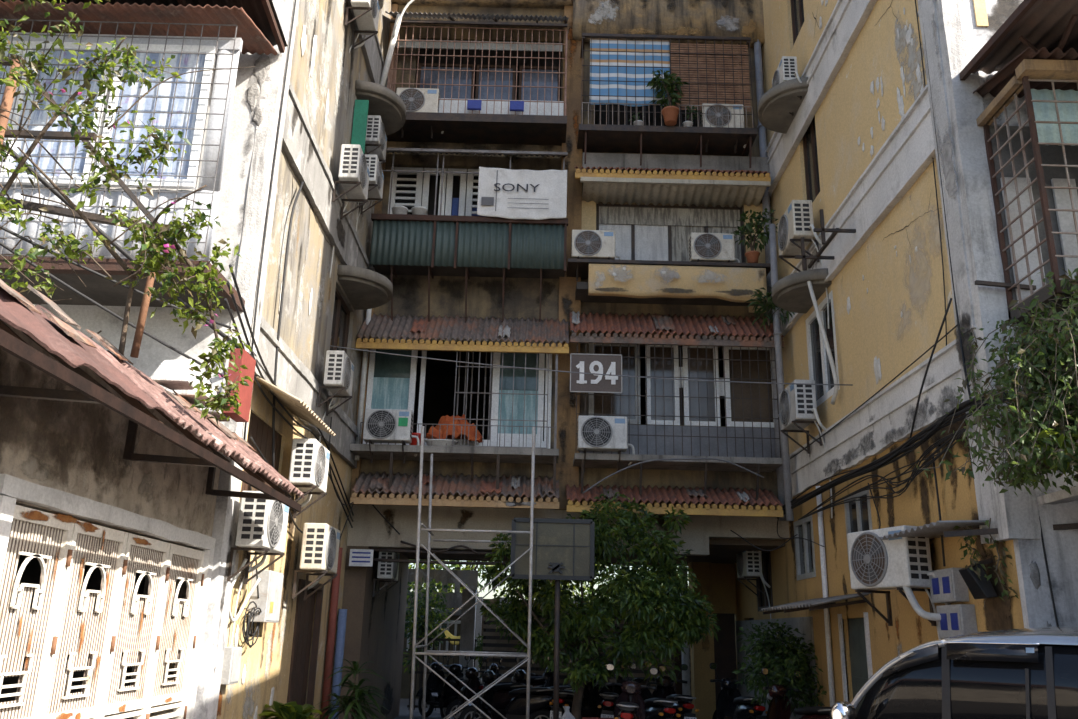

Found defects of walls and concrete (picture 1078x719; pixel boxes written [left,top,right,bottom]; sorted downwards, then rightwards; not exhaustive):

peeling [588,0,617,23]
flaking render [717,17,739,31]
mould [987,0,1023,38]
peeling [895,7,925,119]
peeling [857,77,885,157]
crack [883,190,941,250]
peeling [595,266,632,287]
damp [824,382,973,527]
corrosion [21,510,106,548]
damp [972,512,1013,631]
corrosion [18,616,33,668]